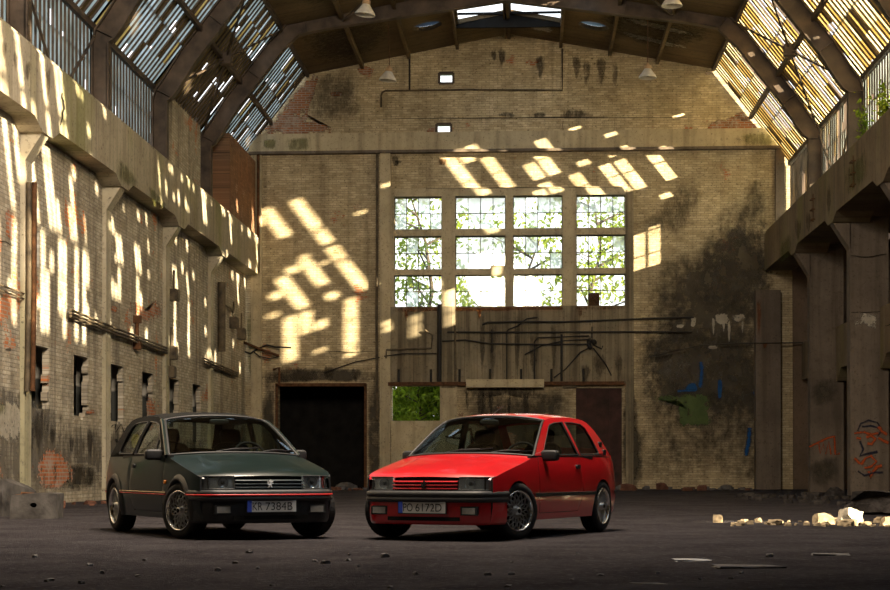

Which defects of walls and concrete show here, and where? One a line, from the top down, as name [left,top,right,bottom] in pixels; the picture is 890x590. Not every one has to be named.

water stain [573,58,605,82]
flaking render [265,75,331,134]
flaking render [708,112,759,129]
peeling [712,313,745,340]
peeling [0,401,20,441]
flaking render [37,449,75,490]